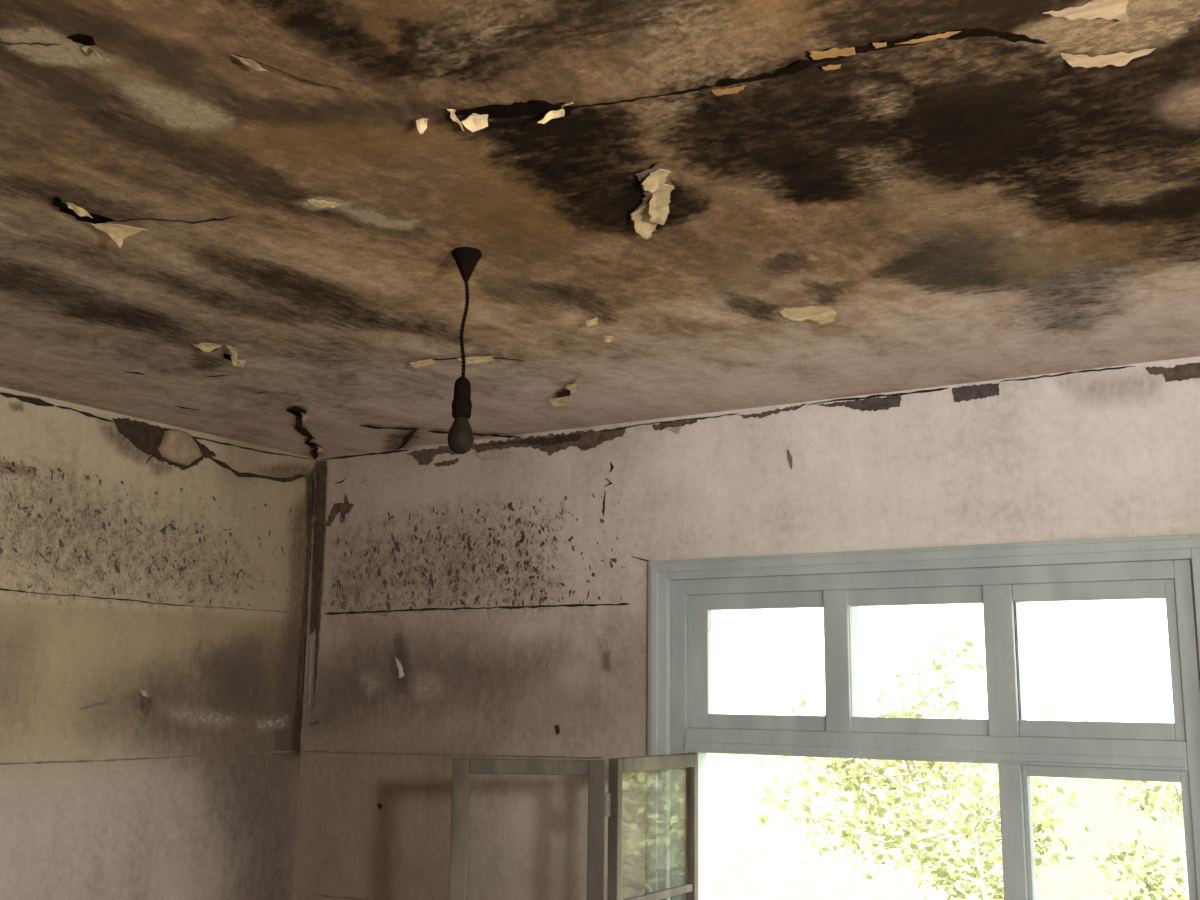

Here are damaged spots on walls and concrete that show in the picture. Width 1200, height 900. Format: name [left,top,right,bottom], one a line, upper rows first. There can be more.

peeling [1013,0,1200,68]
crack [416,28,1047,134]
leakage [0,0,1200,331]
peeling [629,163,674,239]
leakage [258,266,468,344]
peeling [586,317,614,342]
flaking render [0,392,460,483]
crack [205,375,324,460]
flaking render [472,362,1200,461]